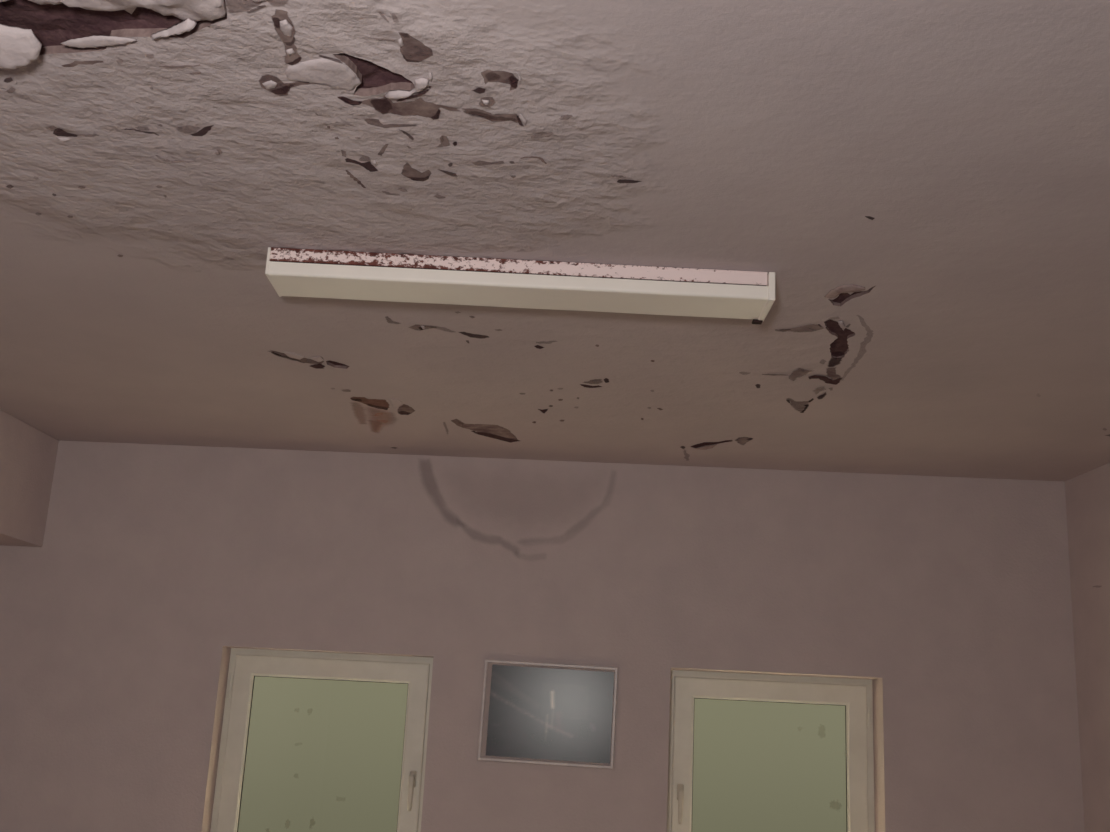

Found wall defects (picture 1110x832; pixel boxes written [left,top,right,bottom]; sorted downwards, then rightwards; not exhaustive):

flaking render [0,0,227,84]
flaking render [247,0,527,140]
flaking render [53,128,77,142]
peeling [345,144,388,172]
peeling [401,163,456,181]
flaking render [825,284,875,306]
peeling [268,350,350,369]
flaking render [756,319,855,413]
peeling [580,378,609,388]
peeling [351,397,415,415]
peeling [451,419,519,443]
peeling [681,437,751,450]